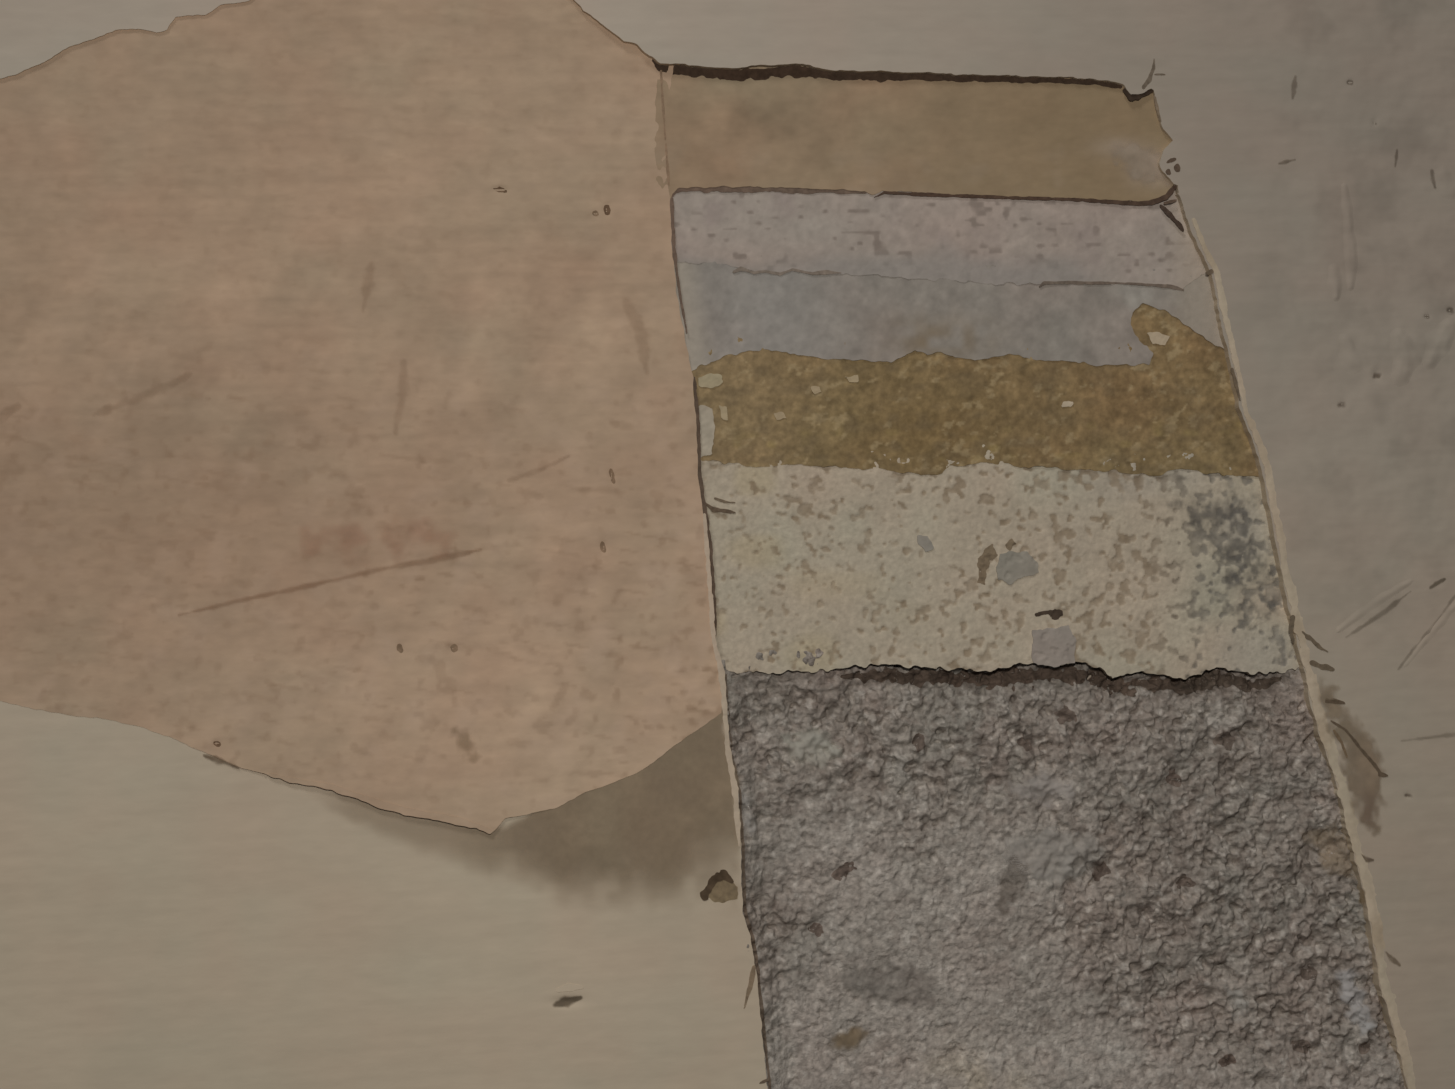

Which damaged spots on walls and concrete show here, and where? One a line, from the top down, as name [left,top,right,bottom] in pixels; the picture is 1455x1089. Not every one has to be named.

peeling [0,0,1173,847]
water stain [495,711,738,879]
crack [652,59,1184,334]
spalling [673,190,1416,1089]